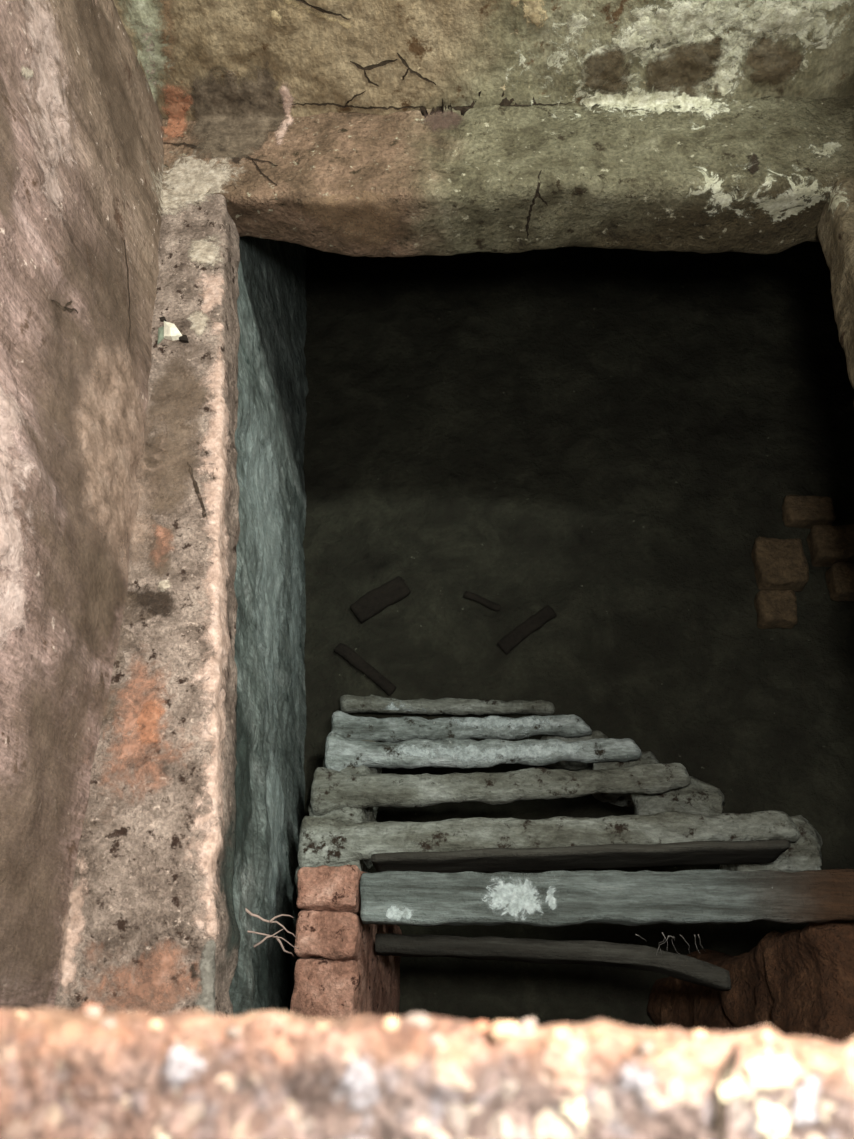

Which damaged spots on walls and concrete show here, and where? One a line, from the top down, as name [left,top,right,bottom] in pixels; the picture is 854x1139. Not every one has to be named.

crack [283,0,351,29]
crack [279,53,571,118]
leakage [506,22,667,120]
leakage [621,0,854,110]
leakage [799,142,842,157]
leakage [686,163,854,222]